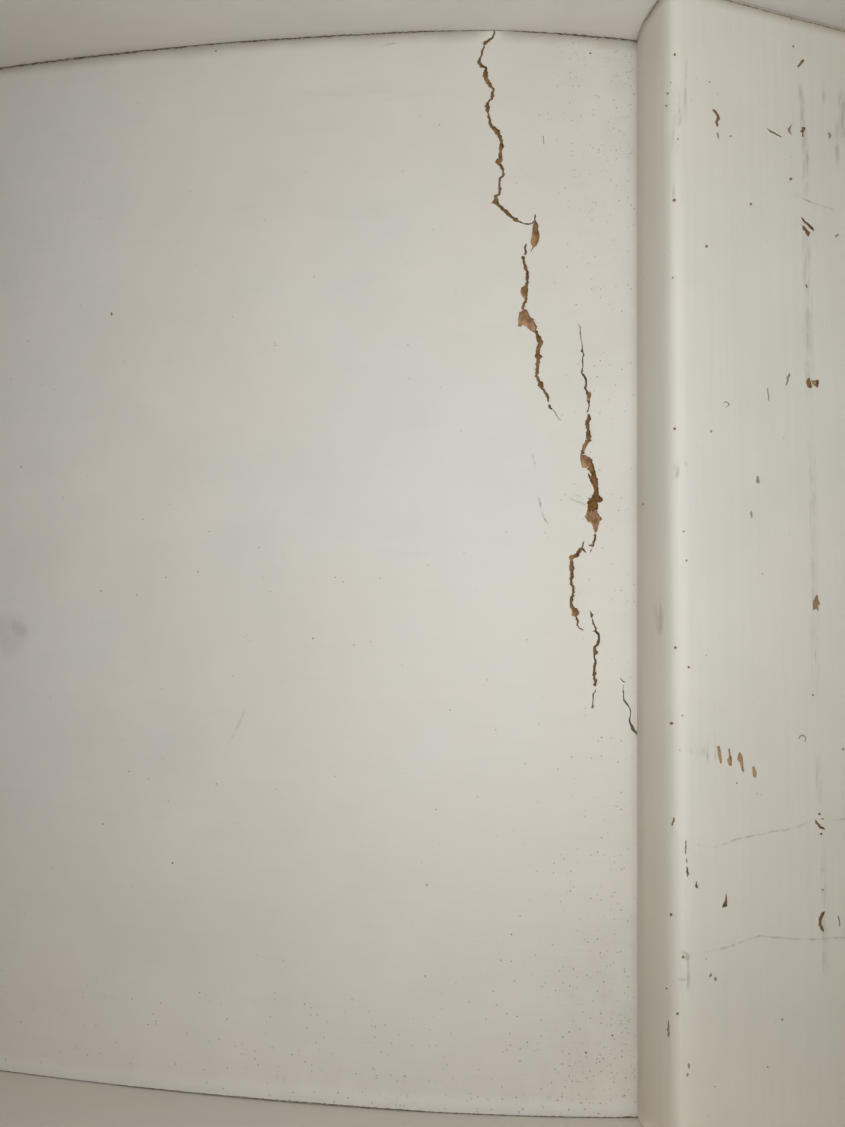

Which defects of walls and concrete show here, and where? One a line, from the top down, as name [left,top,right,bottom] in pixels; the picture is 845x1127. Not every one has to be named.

crack [727,0,845,32]
crack [0,0,659,735]
peeling [717,746,757,784]